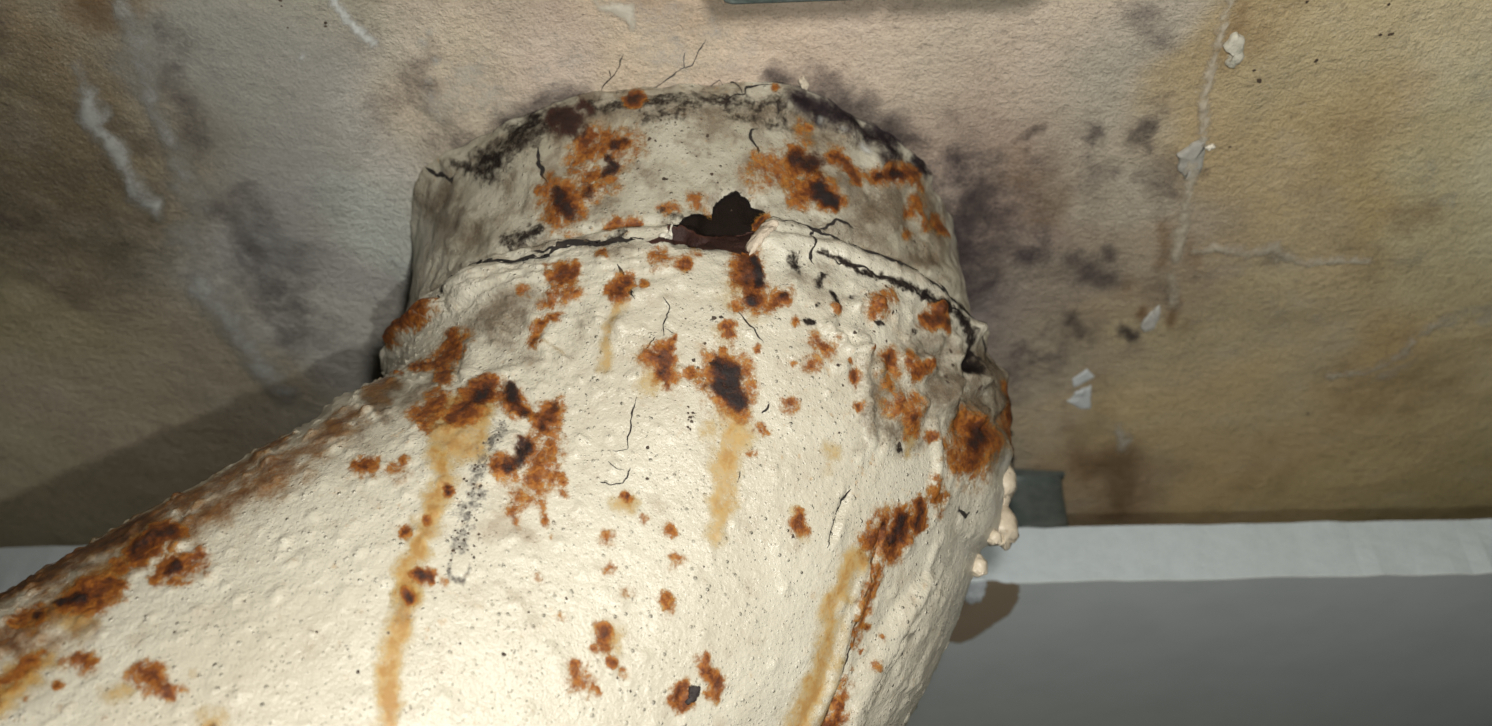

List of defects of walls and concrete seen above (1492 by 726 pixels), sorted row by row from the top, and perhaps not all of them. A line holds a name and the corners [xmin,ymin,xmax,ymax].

leakage [331,0,377,46]
peeling [745,213,779,255]
corrosion [742,117,951,240]
leakage [953,184,989,250]
crack [437,236,673,349]
corrosion [516,248,608,349]
corrosion [600,245,702,370]
crack [738,311,763,341]
crack [771,216,998,436]
leakage [1119,311,1144,340]
corrosion [0,326,569,726]
corrosion [637,246,1014,726]